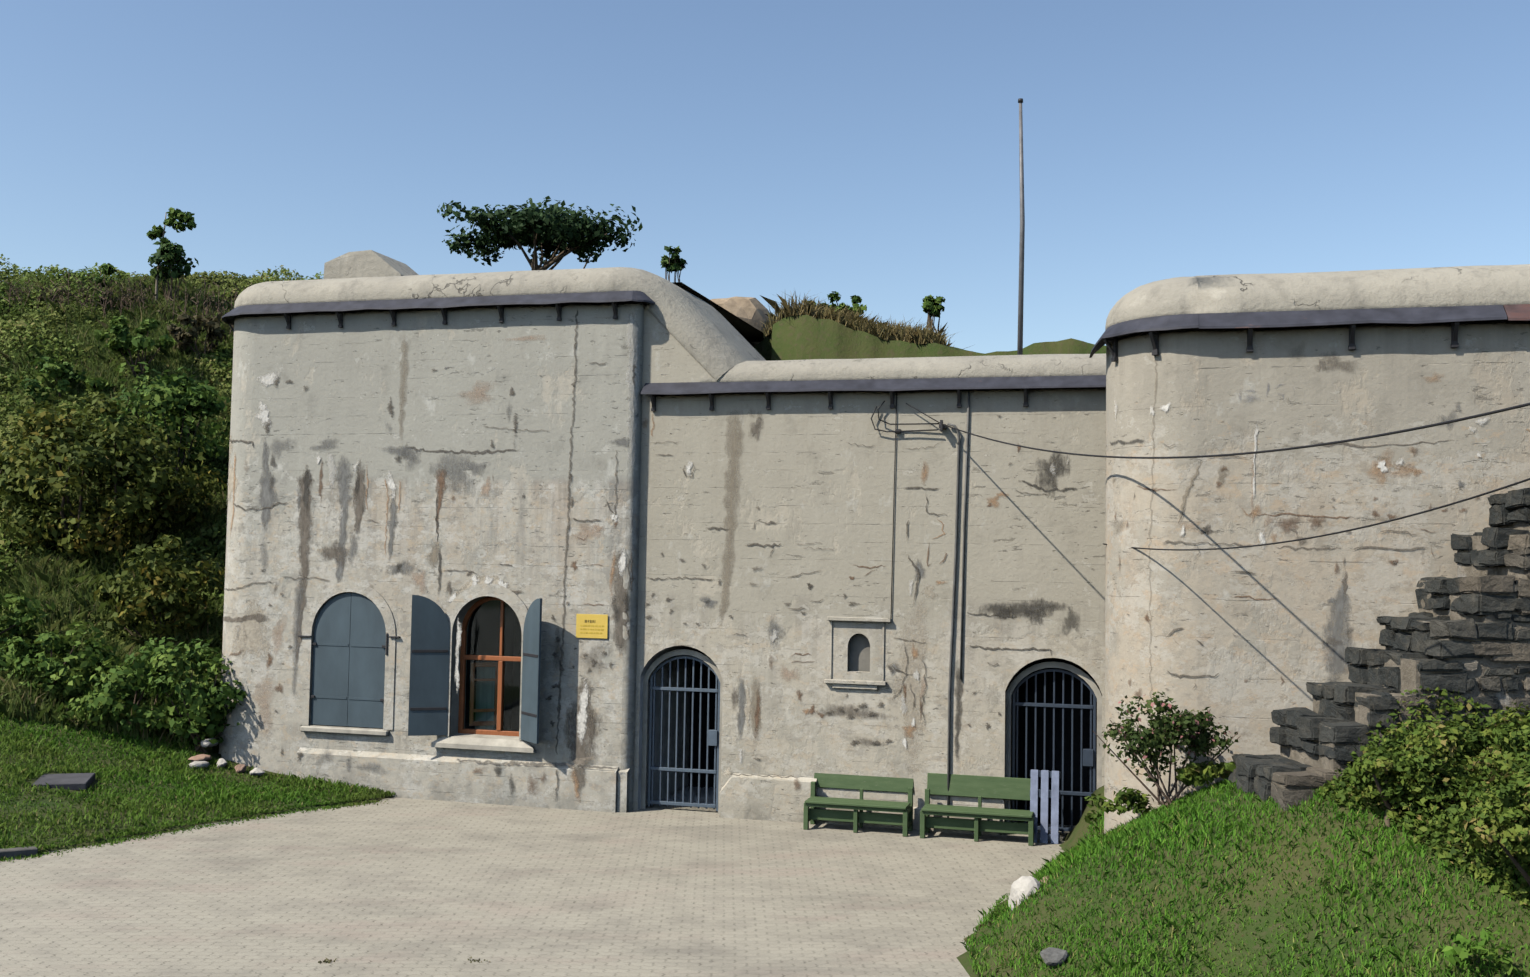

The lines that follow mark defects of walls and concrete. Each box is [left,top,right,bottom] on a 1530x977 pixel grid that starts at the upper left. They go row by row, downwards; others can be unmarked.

water stain [260,443,278,526]
water stain [293,460,356,685]
water stain [384,447,414,574]
rust [415,470,454,589]
water stain [703,417,762,615]
water stain [969,599,1076,627]
water stain [457,681,618,797]
water stain [732,683,745,762]